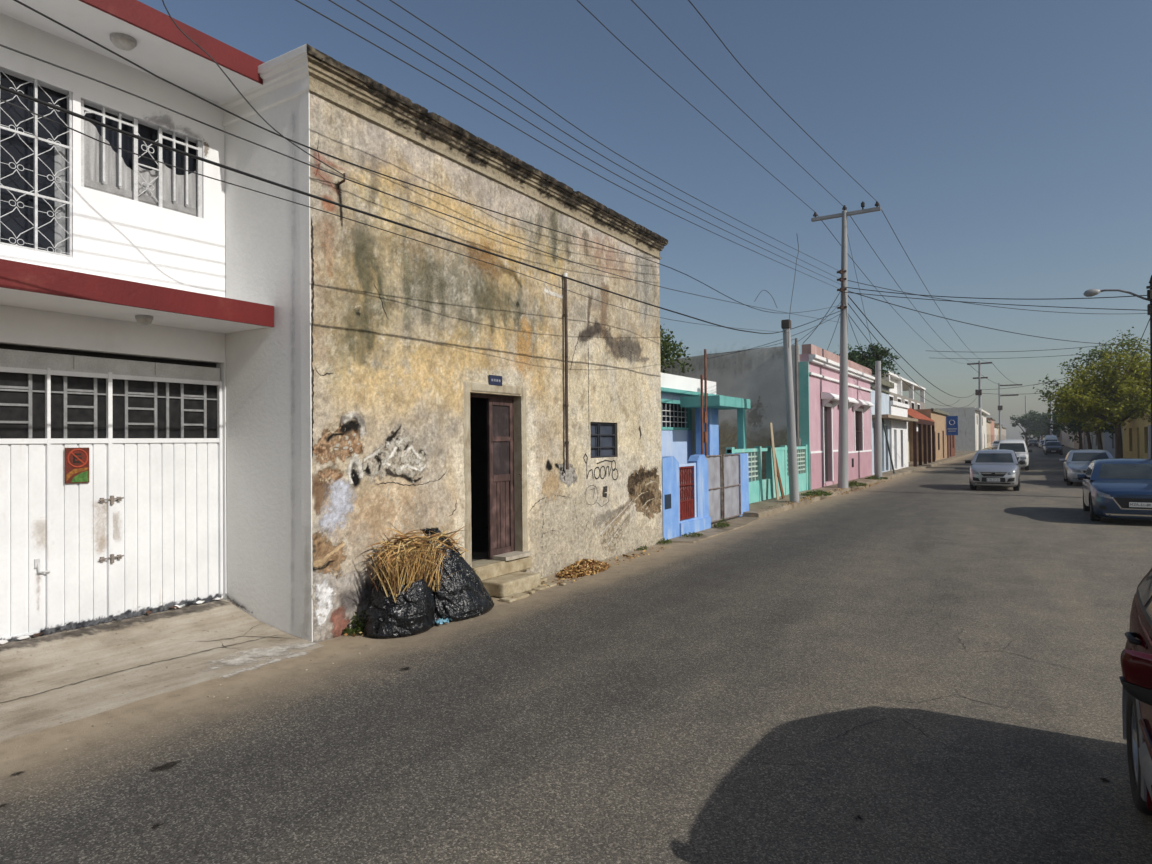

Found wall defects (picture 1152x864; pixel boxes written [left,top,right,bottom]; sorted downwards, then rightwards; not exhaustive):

leakage [355,231,383,299]
leakage [579,286,649,361]
flaking render [313,412,427,487]
flaking render [600,465,662,550]